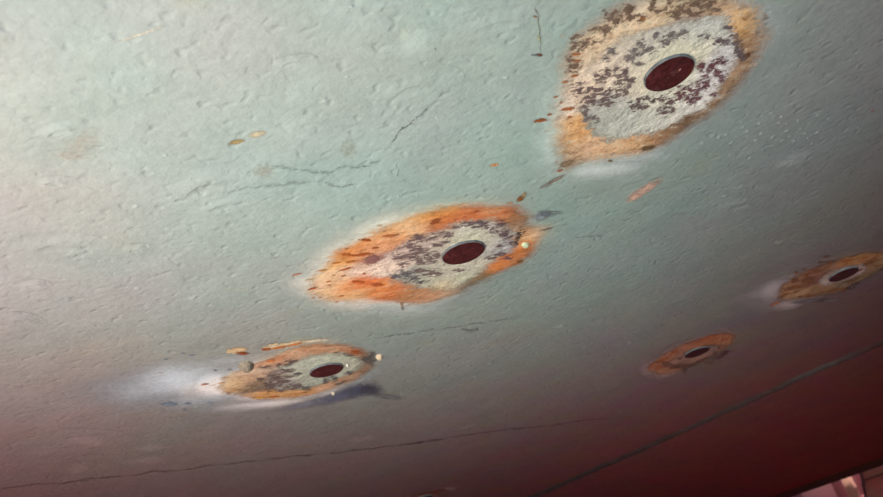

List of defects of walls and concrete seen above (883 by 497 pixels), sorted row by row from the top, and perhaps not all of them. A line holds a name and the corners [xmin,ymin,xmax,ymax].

corrosion [534,0,770,188]
corrosion [292,192,553,311]
corrosion [754,252,883,306]
corrosion [111,339,377,410]
corrosion [648,334,733,376]